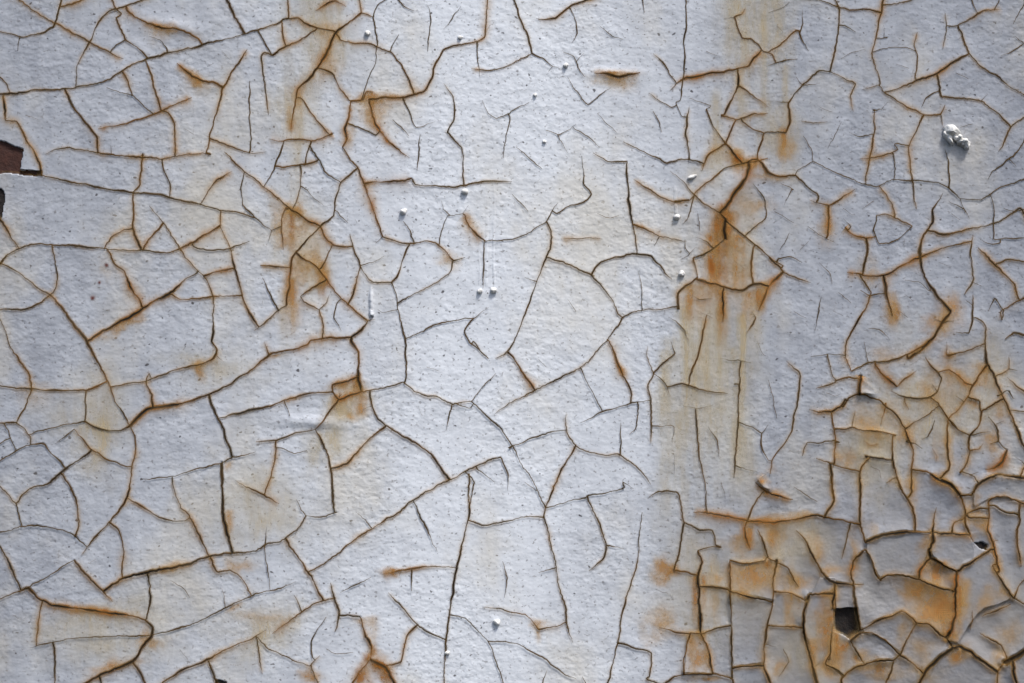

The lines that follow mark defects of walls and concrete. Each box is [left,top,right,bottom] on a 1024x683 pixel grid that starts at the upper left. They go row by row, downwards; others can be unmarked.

spalling [0,141,43,176]
rust [707,205,744,323]
crack [0,0,728,683]
crack [624,0,1024,683]
peeling [805,577,913,666]
peeling [866,533,1011,683]
rust [910,561,967,662]